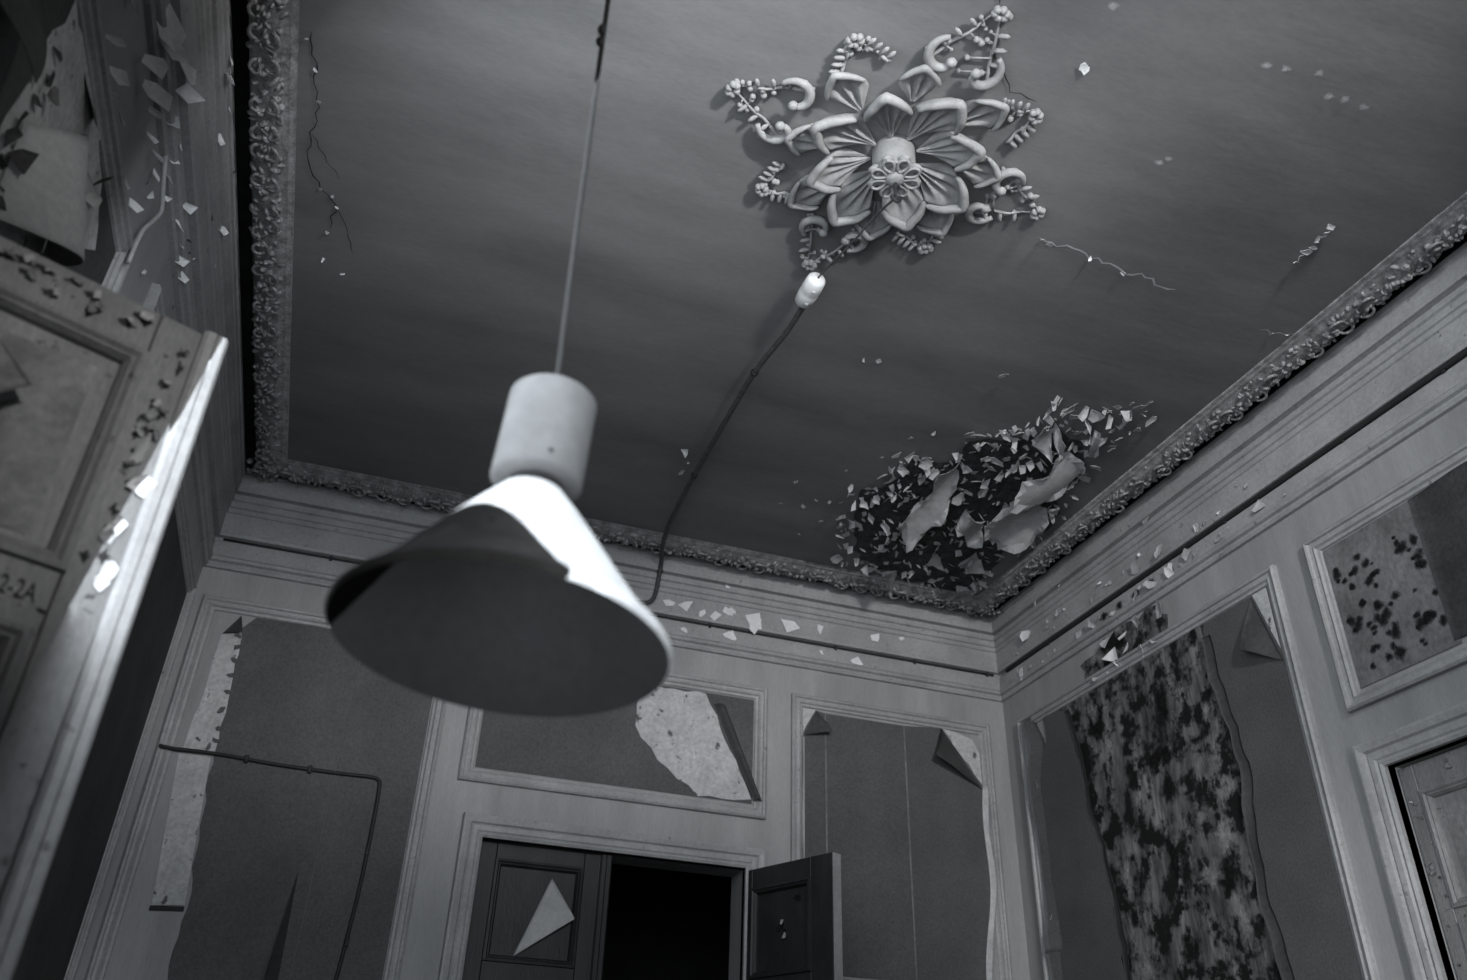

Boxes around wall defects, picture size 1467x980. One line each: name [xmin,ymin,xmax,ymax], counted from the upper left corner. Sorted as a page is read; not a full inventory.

flaking render [0,0,102,250]
peeling [109,0,236,293]
crack [1040,238,1175,290]
peeling [78,347,190,592]
peeling [801,395,1157,600]
peeling [1235,483,1266,512]
peeling [663,600,762,640]
peeling [781,619,824,655]
peeling [1011,600,1068,681]
peeling [1076,511,1229,682]
flaking render [635,687,751,800]